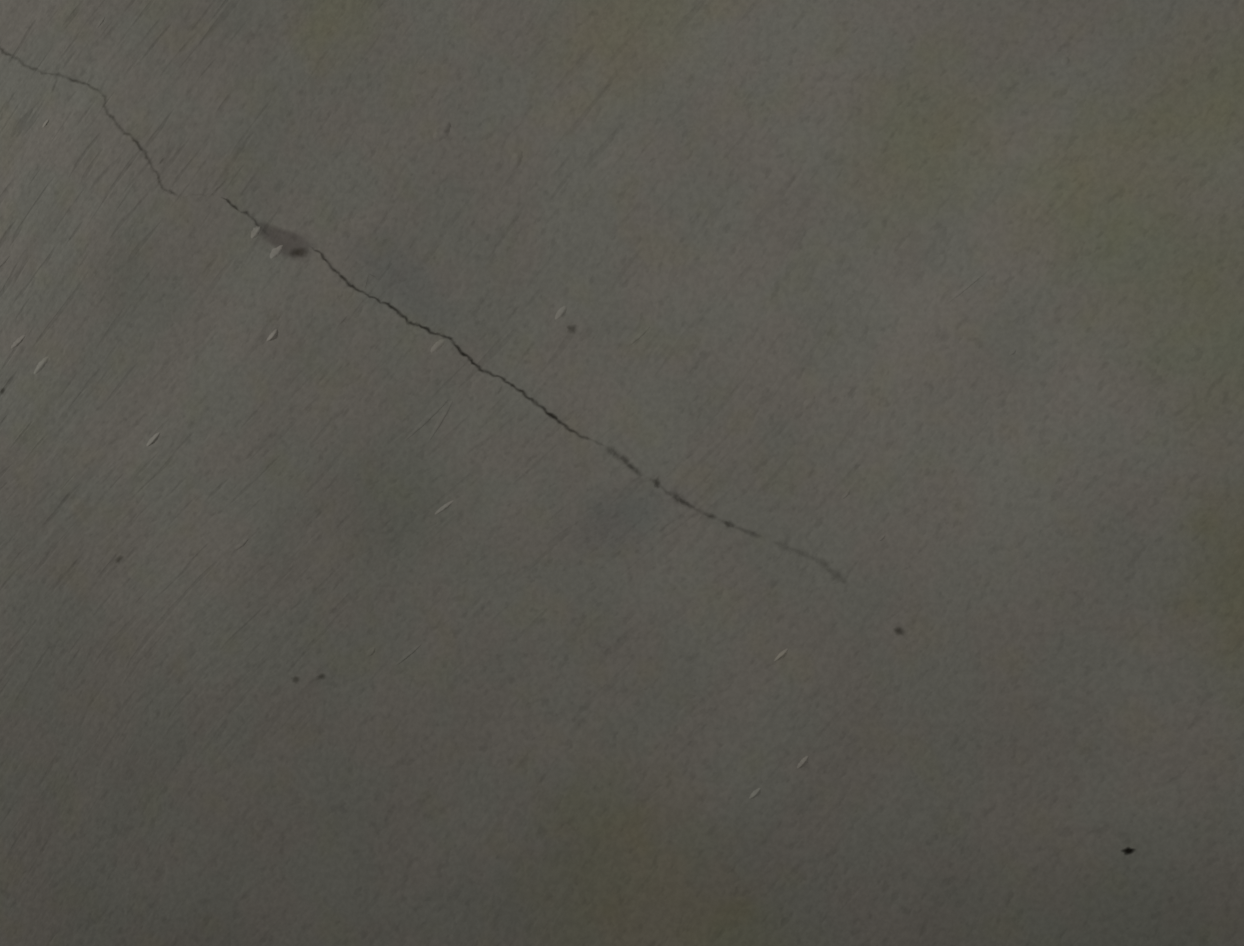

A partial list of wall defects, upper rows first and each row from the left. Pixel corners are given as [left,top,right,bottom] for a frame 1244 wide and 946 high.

crack [387,303,482,371]
crack [511,384,566,426]